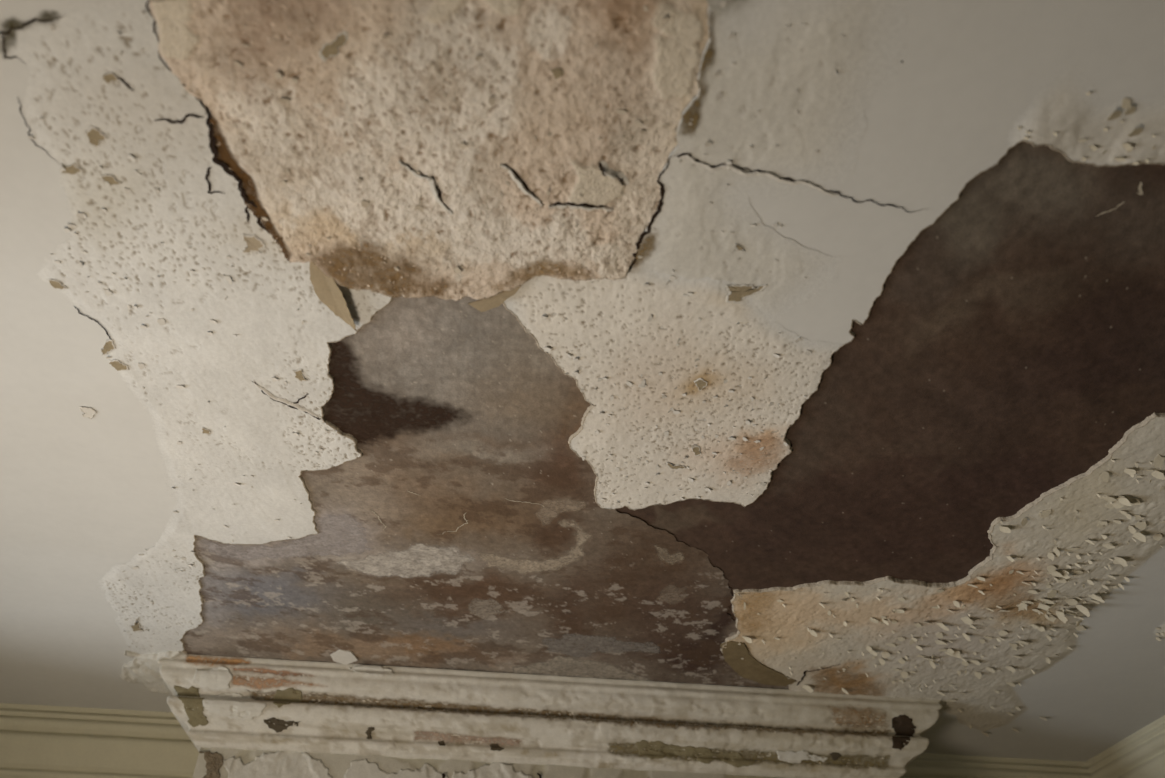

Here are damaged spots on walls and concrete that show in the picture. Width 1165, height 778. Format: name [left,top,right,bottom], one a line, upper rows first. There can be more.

crack [0,16,62,63]
crack [17,97,62,166]
crack [398,160,453,215]
crack [499,153,927,274]
peeling [6,0,360,654]
spalling [180,63,1165,737]
peeling [199,744,532,778]
peeling [635,740,755,768]